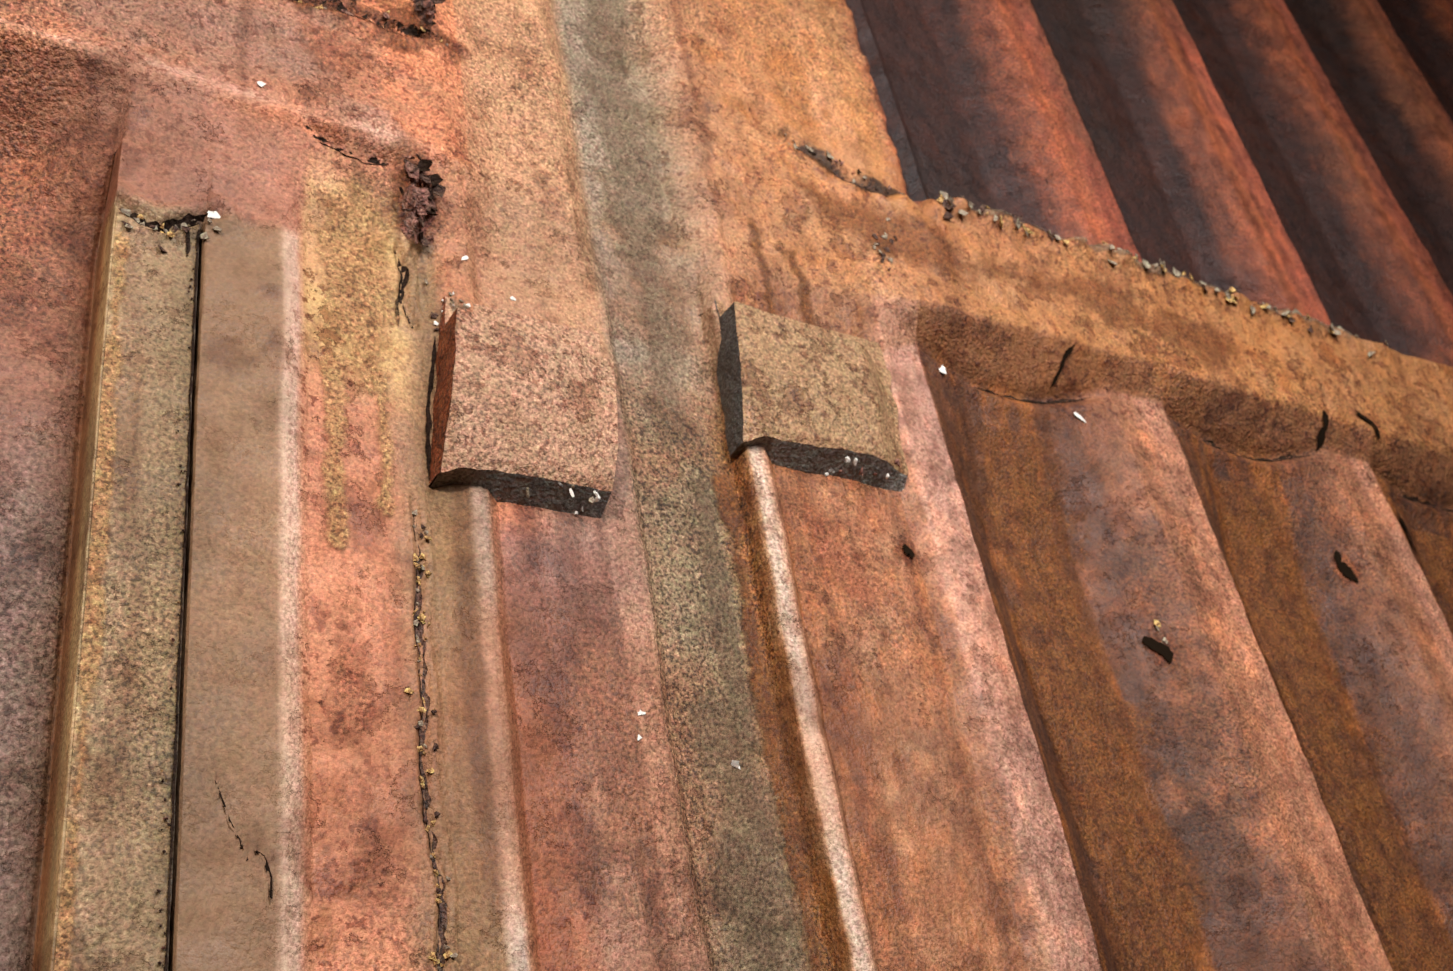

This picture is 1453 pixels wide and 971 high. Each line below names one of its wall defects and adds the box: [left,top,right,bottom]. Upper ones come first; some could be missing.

crack [215,781,272,899]